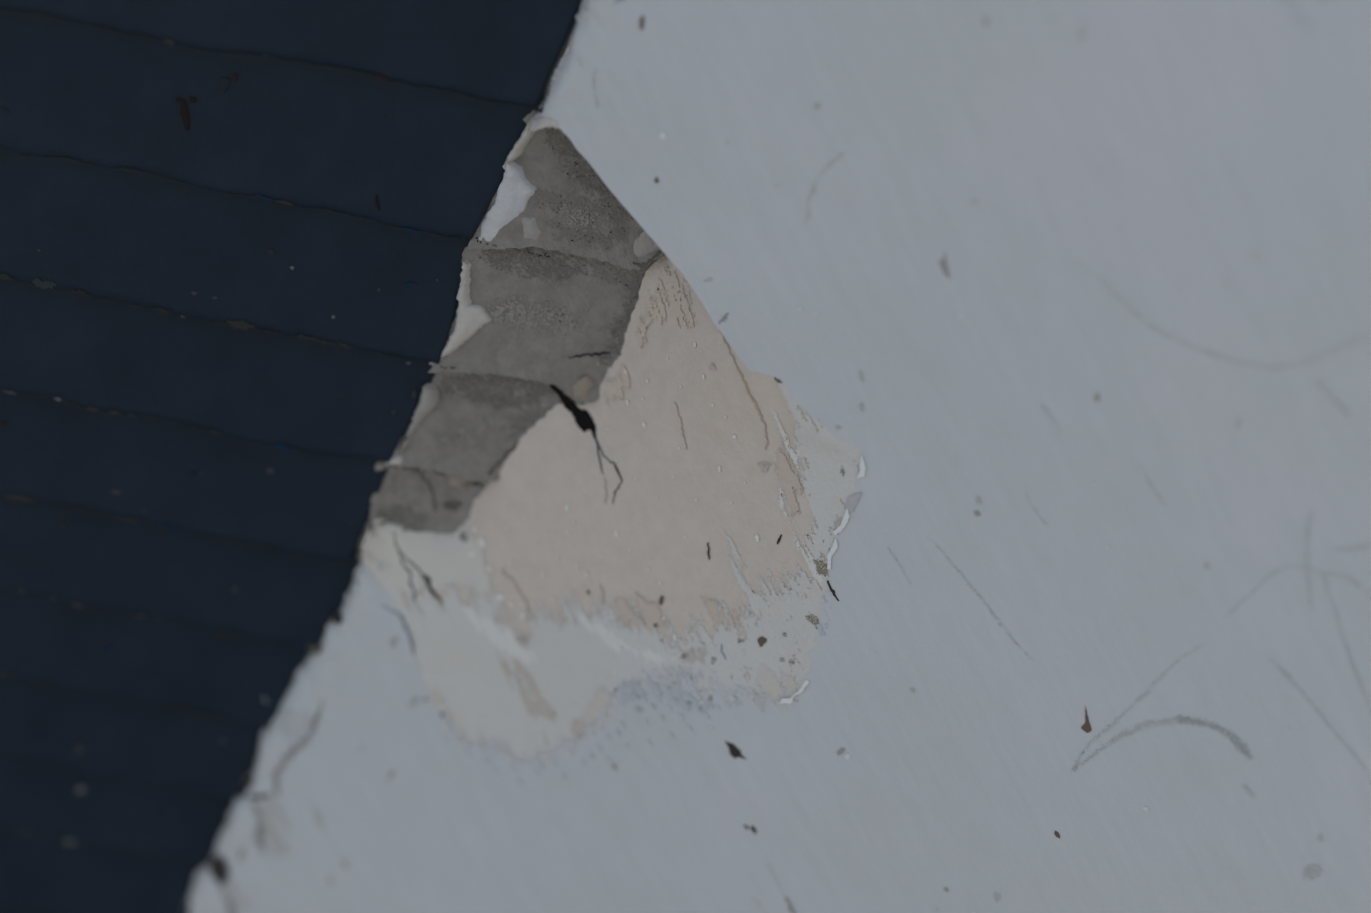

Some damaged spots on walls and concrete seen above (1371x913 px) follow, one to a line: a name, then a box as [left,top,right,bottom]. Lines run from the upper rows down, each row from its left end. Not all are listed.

spalling [182,0,866,913]